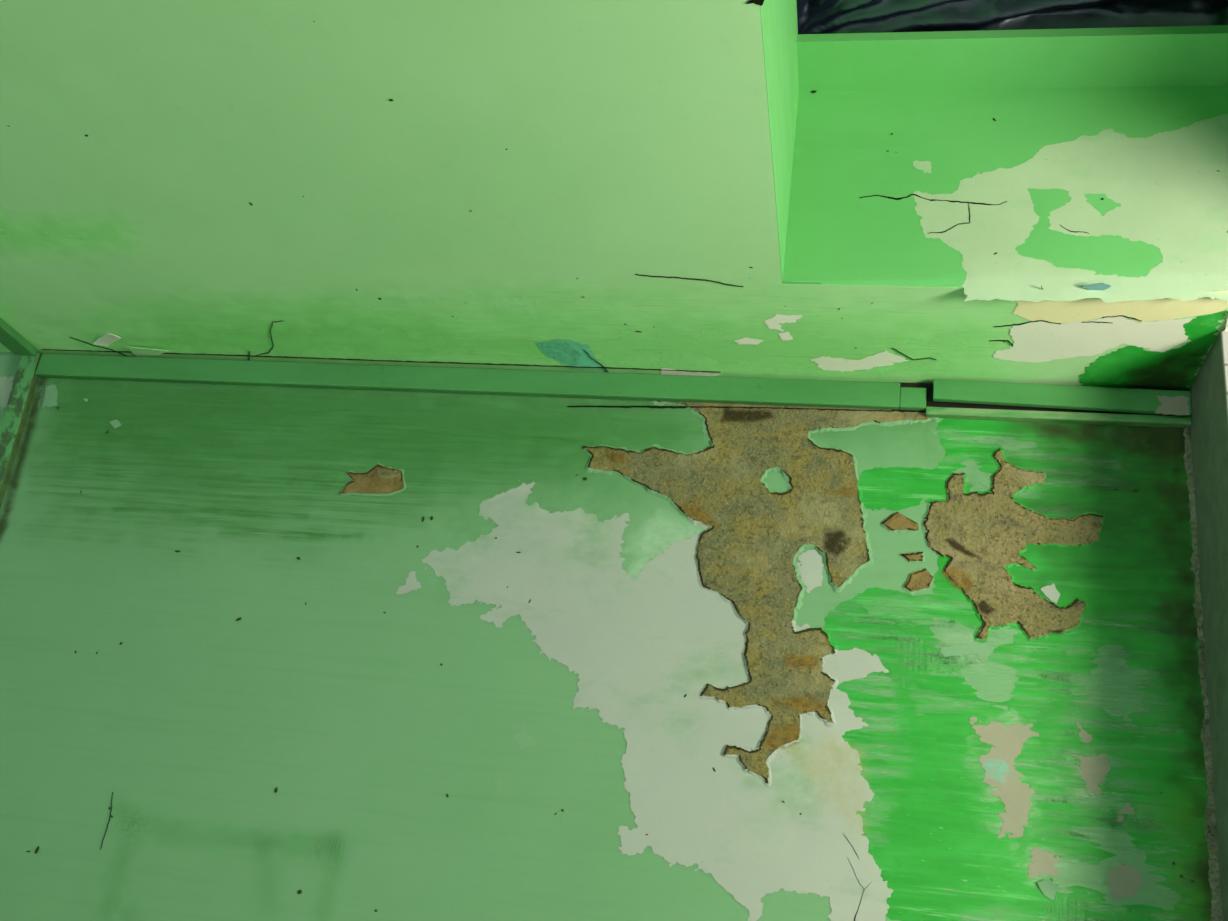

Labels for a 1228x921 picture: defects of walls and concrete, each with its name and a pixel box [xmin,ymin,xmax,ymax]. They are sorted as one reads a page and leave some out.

crack [860,194,1007,234]
flaking render [339,463,406,497]
peeling [396,114,1228,921]